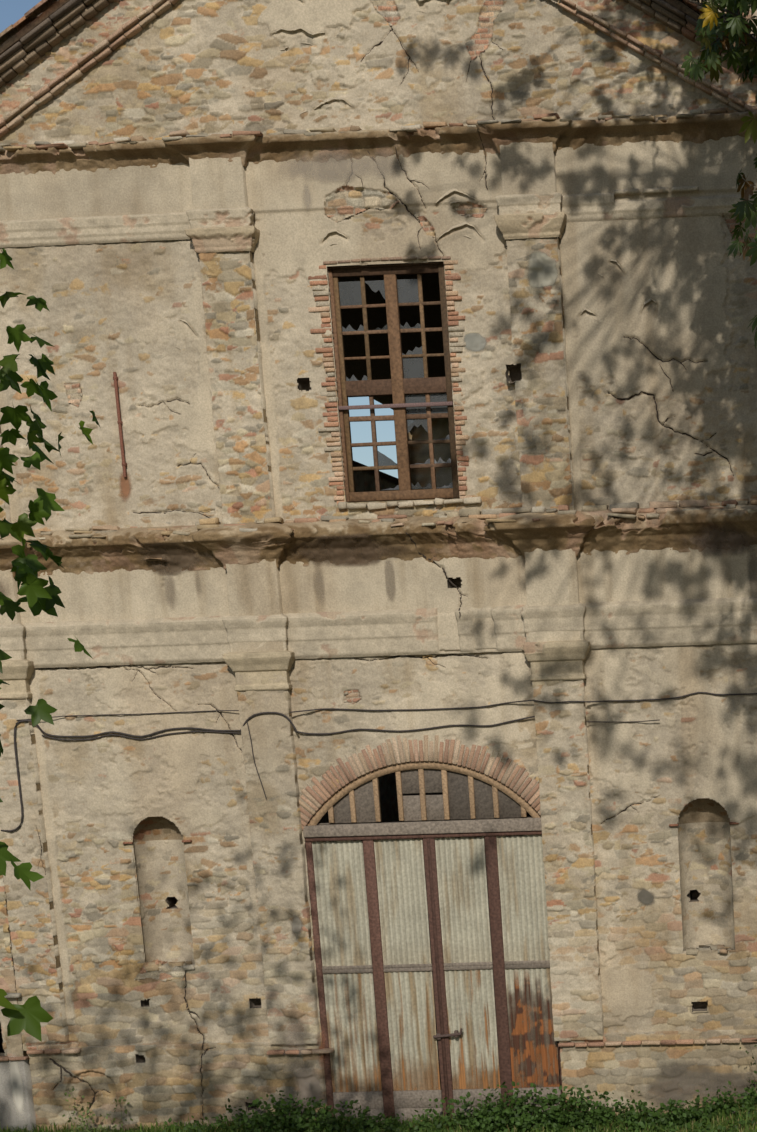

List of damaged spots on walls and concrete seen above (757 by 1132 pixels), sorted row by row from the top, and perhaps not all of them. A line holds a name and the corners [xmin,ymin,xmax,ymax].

spalling [370,0,400,26]
crack [361,5,419,83]
spalling [465,0,503,60]
crack [346,147,444,256]
crack [608,337,734,476]
rust [120,475,130,498]
crack [406,533,468,619]
spalling [166,897,178,909]
crack [184,972,216,1116]
spalling [249,997,261,1008]
rust [401,978,560,1091]